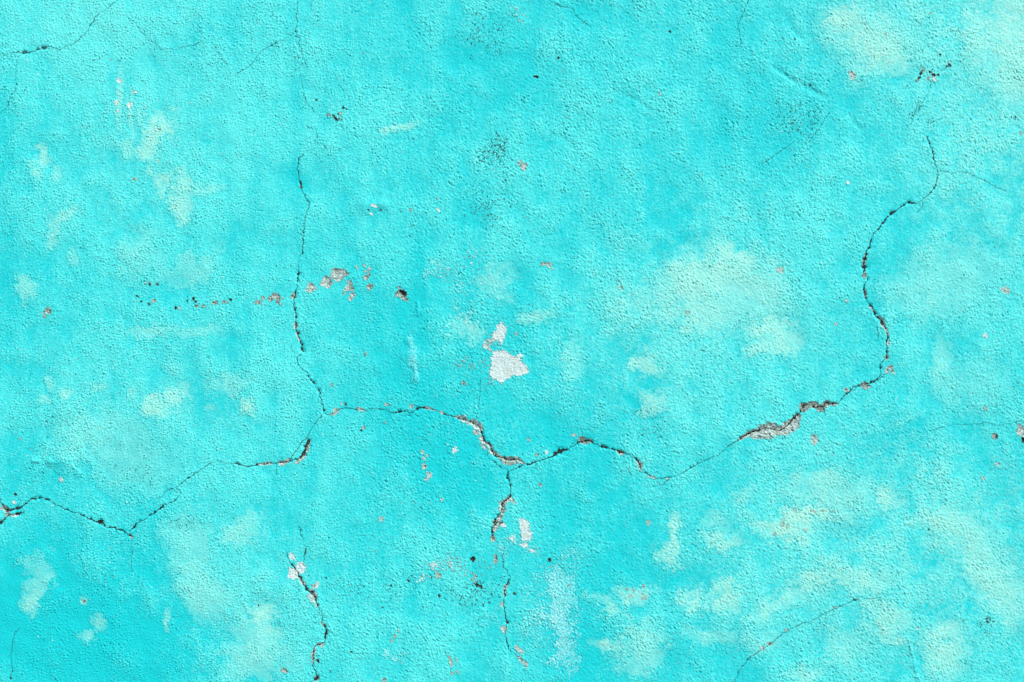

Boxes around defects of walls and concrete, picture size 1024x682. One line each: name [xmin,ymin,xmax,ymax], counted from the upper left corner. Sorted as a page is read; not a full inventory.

spalling [305,264,373,301]
peeling [482,321,529,385]
crack [0,137,1001,682]
crack [735,597,881,682]